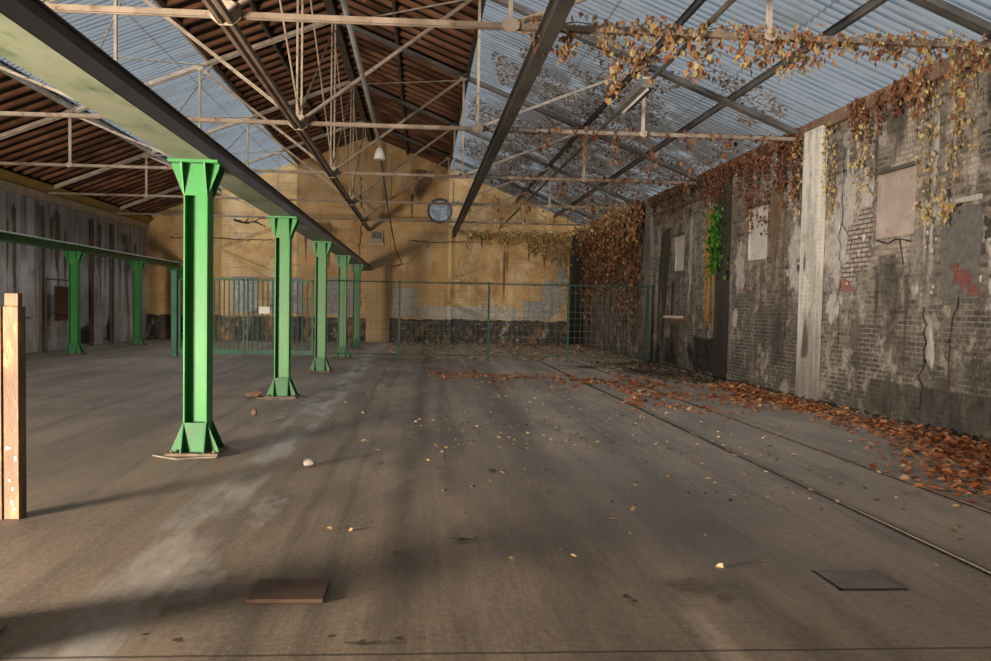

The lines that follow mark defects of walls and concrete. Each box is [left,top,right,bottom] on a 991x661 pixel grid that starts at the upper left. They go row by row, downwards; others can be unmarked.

peeling [733,240,746,296]
peeling [786,210,812,357]
peeling [824,167,876,324]
peeling [979,199,991,310]